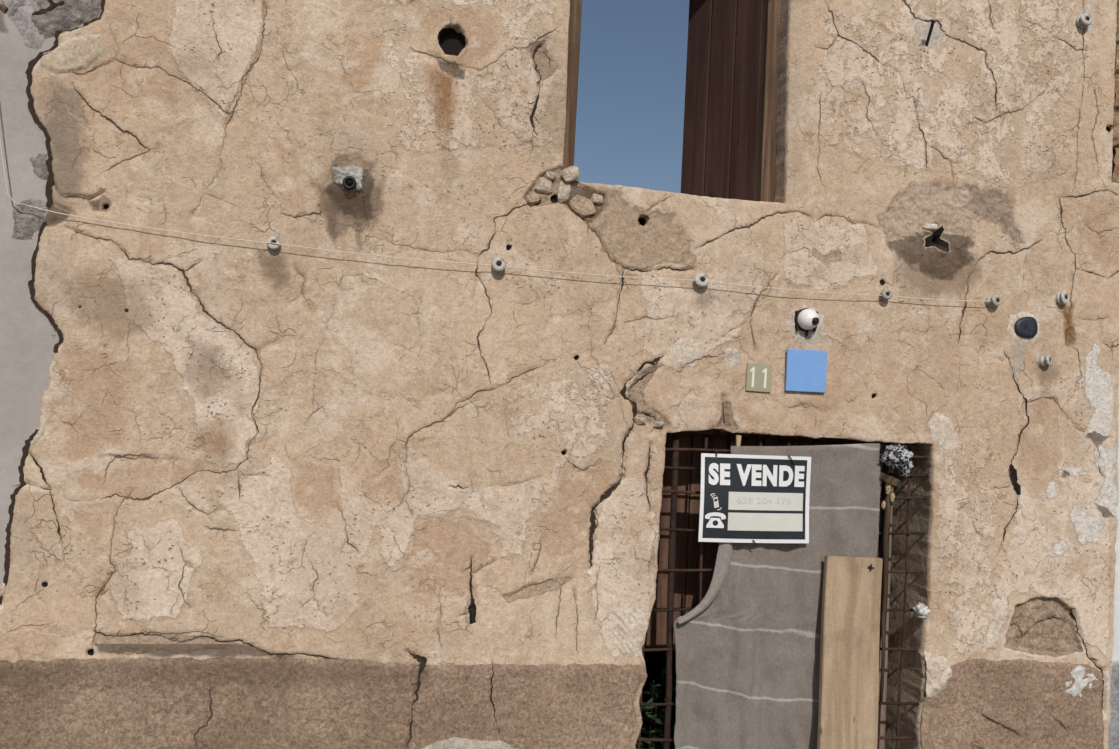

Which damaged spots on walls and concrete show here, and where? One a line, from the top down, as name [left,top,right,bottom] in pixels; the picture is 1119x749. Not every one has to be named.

spalling [1,0,107,74]
crack [25,0,267,353]
crack [0,229,343,659]
crack [391,203,539,518]
crack [411,28,559,152]
spalling [523,166,696,272]
crack [509,273,778,654]
crack [568,205,878,344]
crack [904,0,1119,554]
peeling [1053,343,1119,556]
crack [406,557,494,749]
spalling [985,597,1084,657]